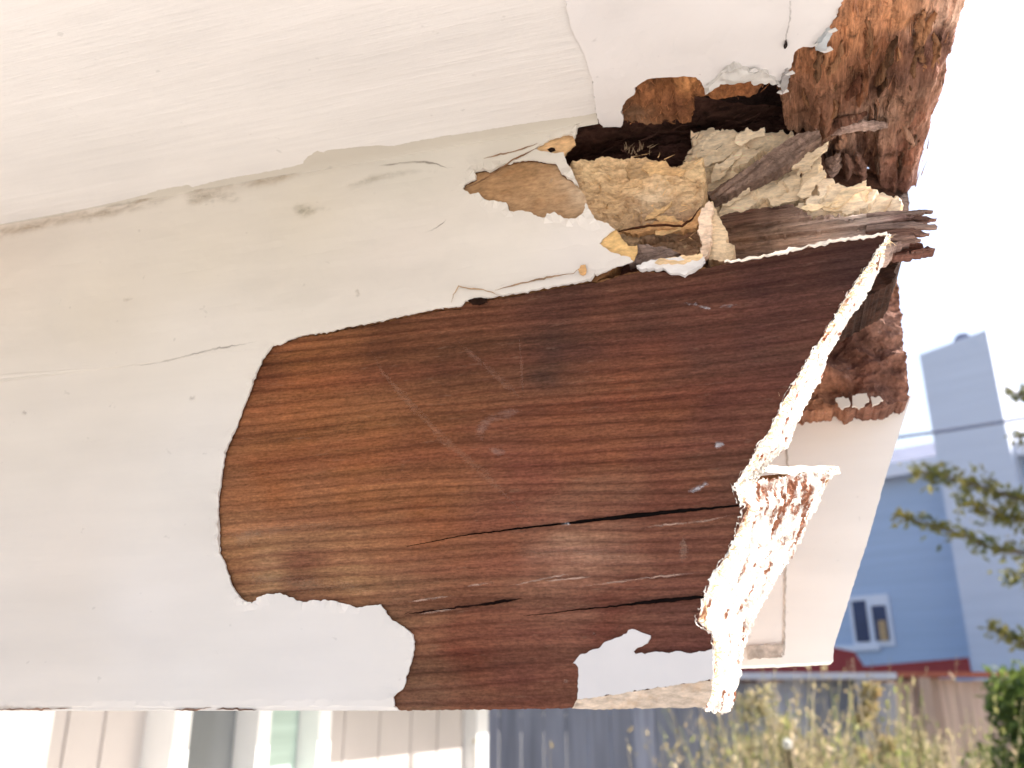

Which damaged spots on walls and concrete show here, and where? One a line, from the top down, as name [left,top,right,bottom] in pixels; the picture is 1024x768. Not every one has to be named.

peeling [813,27,838,53]
peeling [698,62,795,107]
peeling [220,127,904,711]
crack [406,504,739,547]
crack [410,595,704,616]